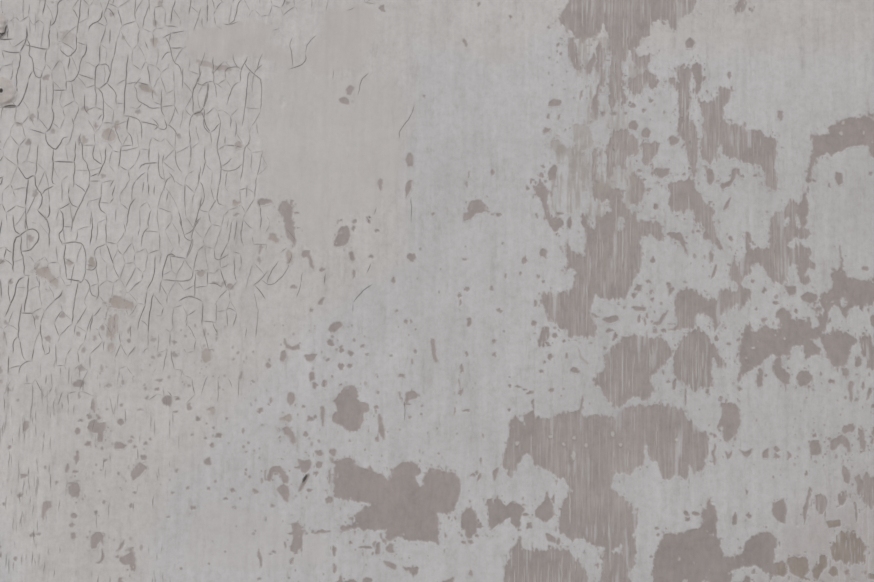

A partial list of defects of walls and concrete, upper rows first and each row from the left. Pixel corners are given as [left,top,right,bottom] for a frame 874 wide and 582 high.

crack [0,0,374,582]
peeling [257,0,874,582]